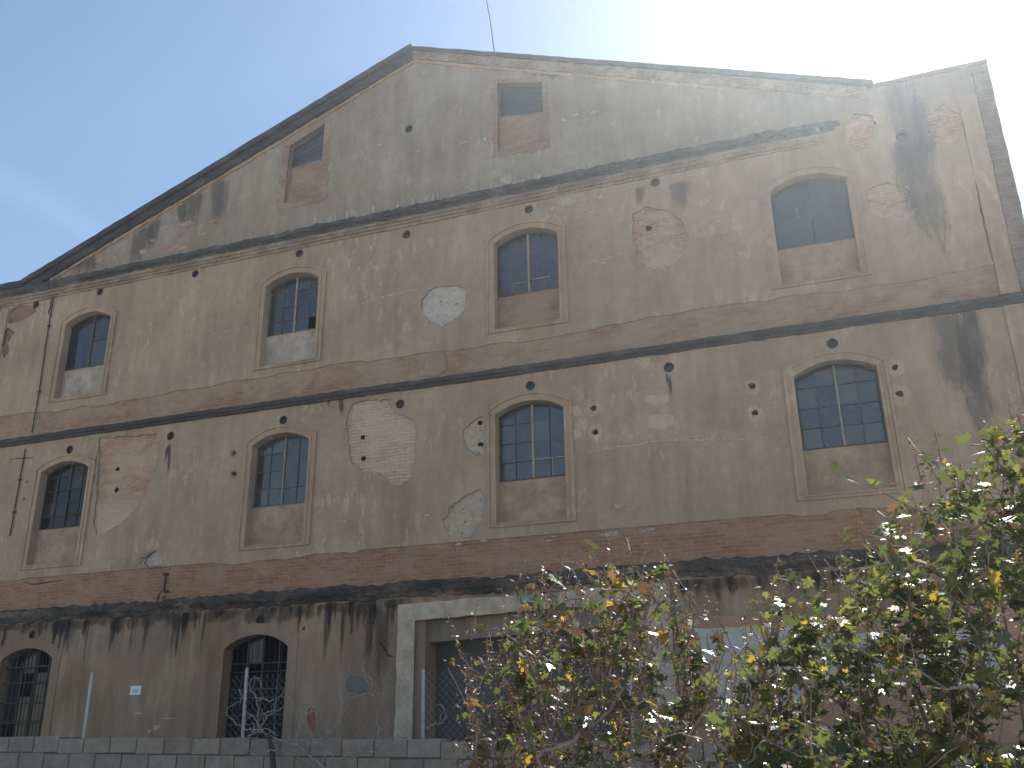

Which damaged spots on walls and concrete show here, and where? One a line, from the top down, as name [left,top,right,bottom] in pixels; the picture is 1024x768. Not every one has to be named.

spalling [630,207,688,271]
spalling [1,305,39,356]
spalling [421,286,466,326]
spalling [347,397,418,486]
spalling [92,432,161,535]
spalling [424,490,488,546]